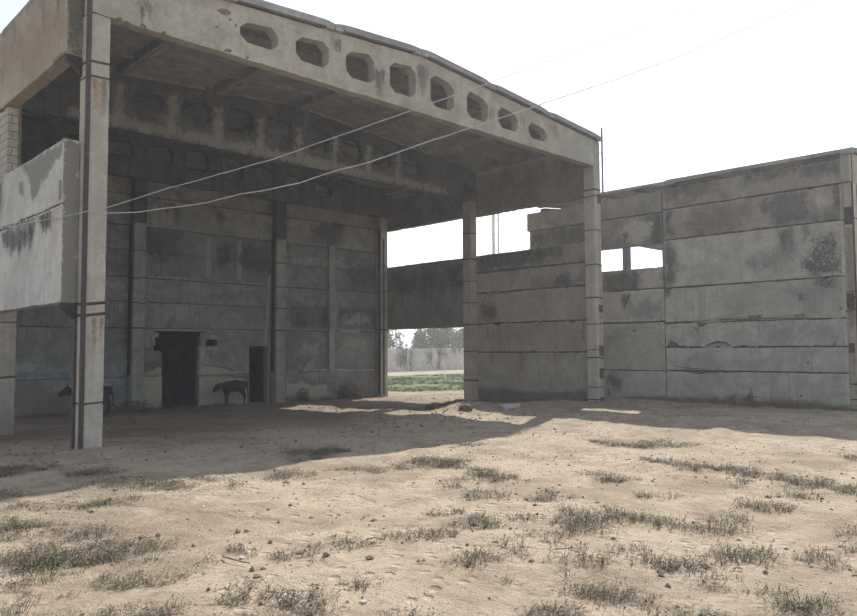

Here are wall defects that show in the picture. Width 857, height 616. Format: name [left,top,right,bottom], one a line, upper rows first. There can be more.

damp [2,214,50,255]
damp [804,234,841,286]
spalling [678,313,847,327]